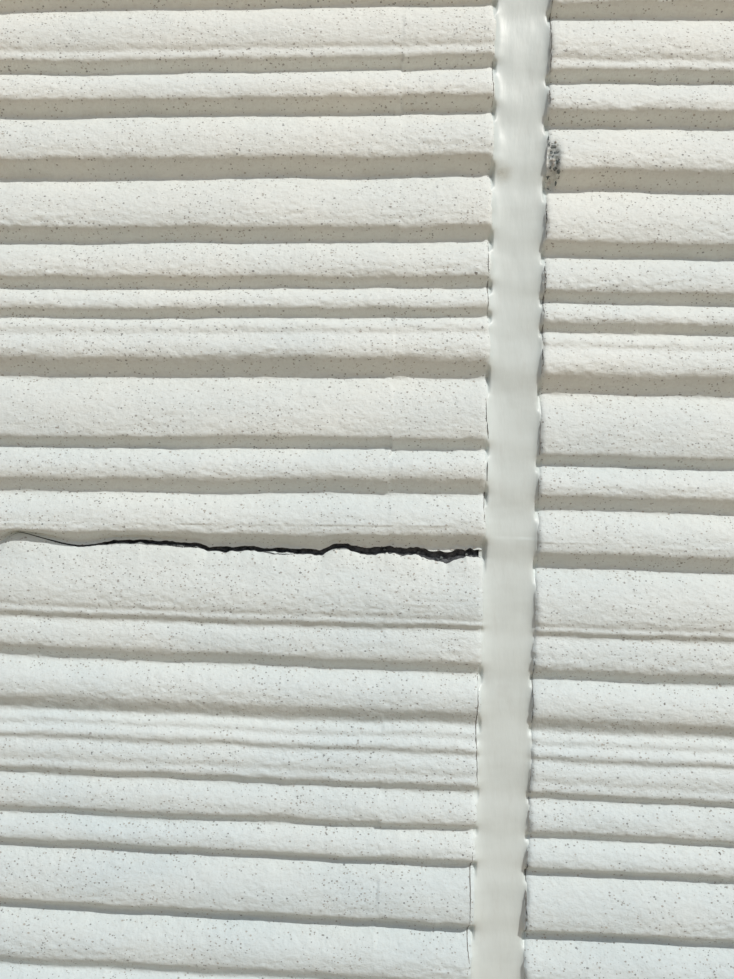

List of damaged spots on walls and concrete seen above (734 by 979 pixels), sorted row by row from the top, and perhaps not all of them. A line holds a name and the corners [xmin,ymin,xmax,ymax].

crack [15,532,480,564]